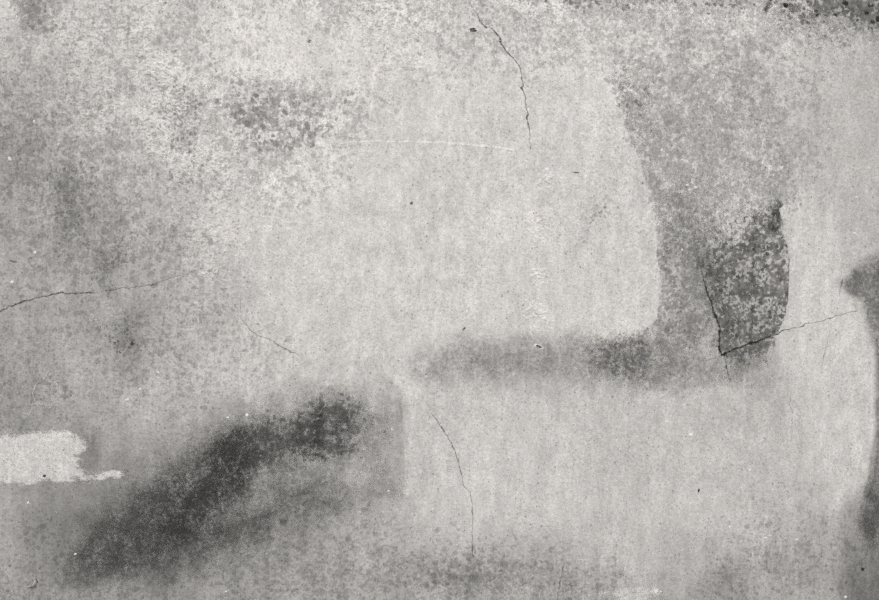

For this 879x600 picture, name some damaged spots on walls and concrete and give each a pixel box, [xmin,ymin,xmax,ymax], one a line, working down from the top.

water stain [698,204,790,369]
crack [702,274,805,368]
water stain [842,258,879,368]
peeling [0,366,124,488]
water stain [78,406,349,582]